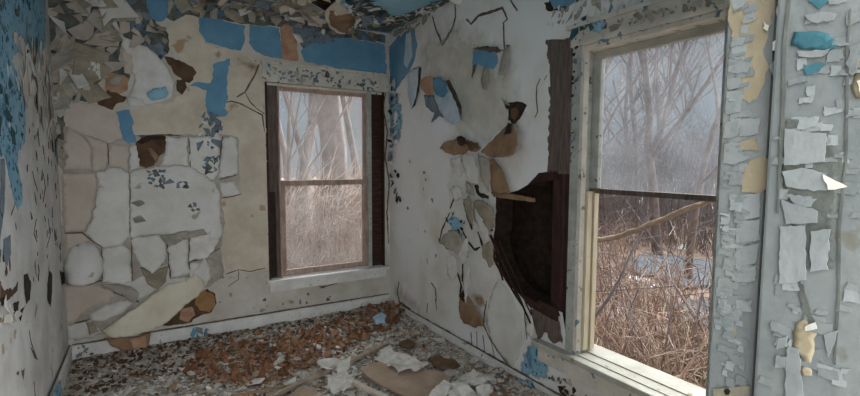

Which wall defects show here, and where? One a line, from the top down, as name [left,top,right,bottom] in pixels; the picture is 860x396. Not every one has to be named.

crack [432,0,518,48]
peeling [805,11,836,23]
peeling [797,49,830,57]
peeling [846,43,860,97]
crack [226,64,265,132]
flaking render [0,0,462,358]
spalling [427,0,778,324]
peeling [775,118,847,396]
peeling [548,375,598,396]